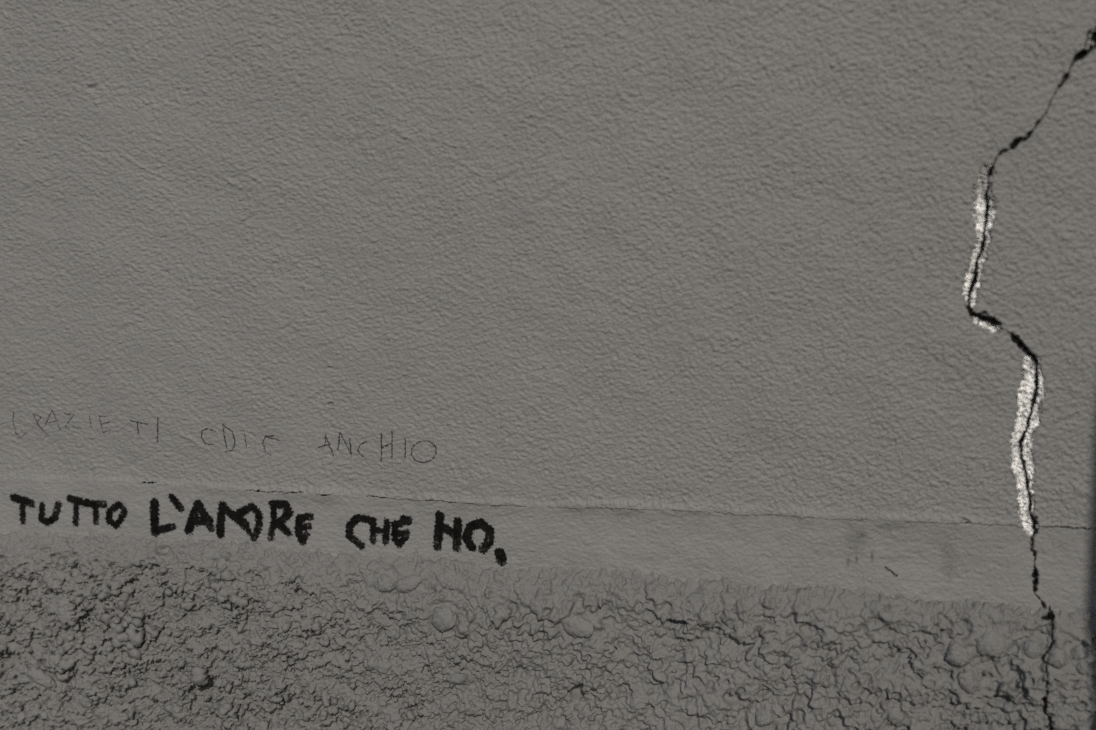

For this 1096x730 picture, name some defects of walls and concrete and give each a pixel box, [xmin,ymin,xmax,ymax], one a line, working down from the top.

crack [245,488,331,496]
crack [899,28,1096,730]